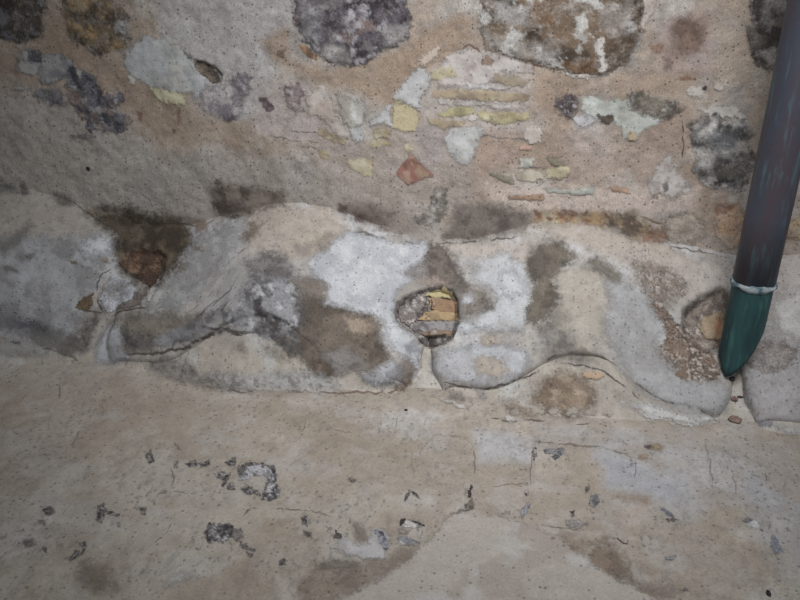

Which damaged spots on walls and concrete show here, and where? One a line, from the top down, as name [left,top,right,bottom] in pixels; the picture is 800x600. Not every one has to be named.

damp [85,205,207,286]
damp [339,204,393,225]
damp [446,207,529,239]
crack [84,269,147,316]
crack [127,273,275,356]
damp [117,250,419,392]
peeling [307,231,428,385]
peeling [601,259,800,435]
crack [446,372,535,390]
crack [548,354,639,399]
spalling [173,457,281,501]
spalling [204,523,256,557]